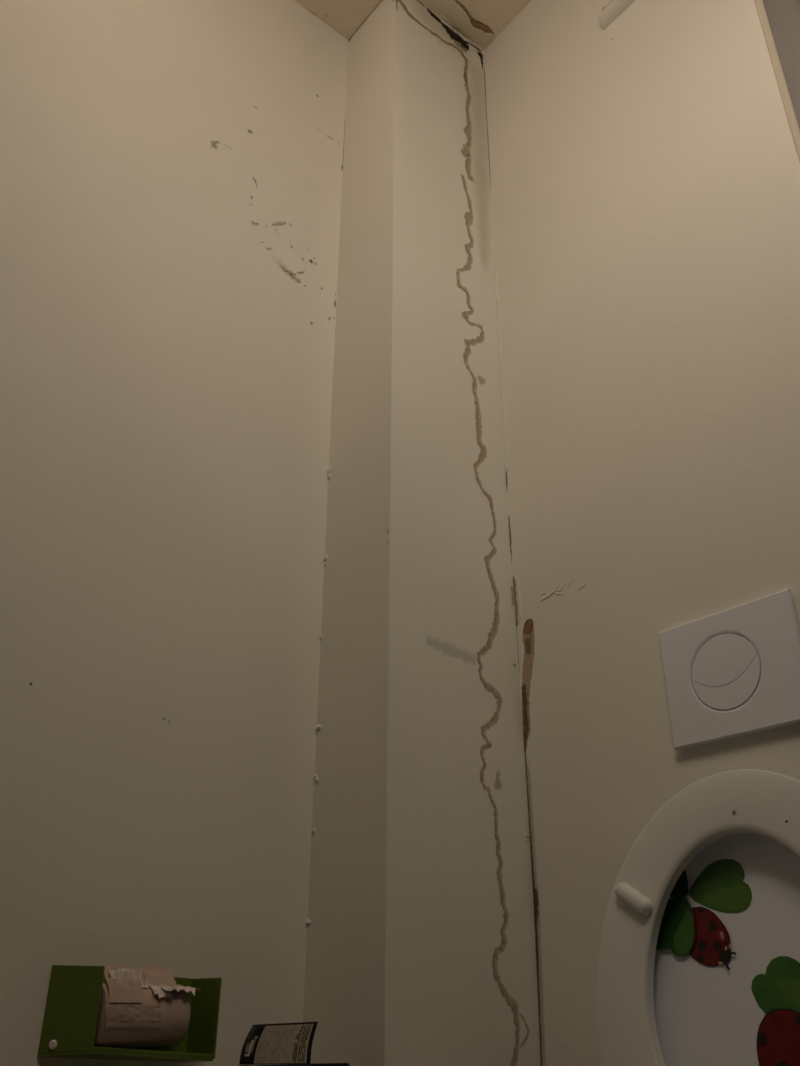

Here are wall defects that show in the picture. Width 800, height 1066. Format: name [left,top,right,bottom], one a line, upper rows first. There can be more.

peeling [430,0,494,48]
crack [525,757,542,1066]